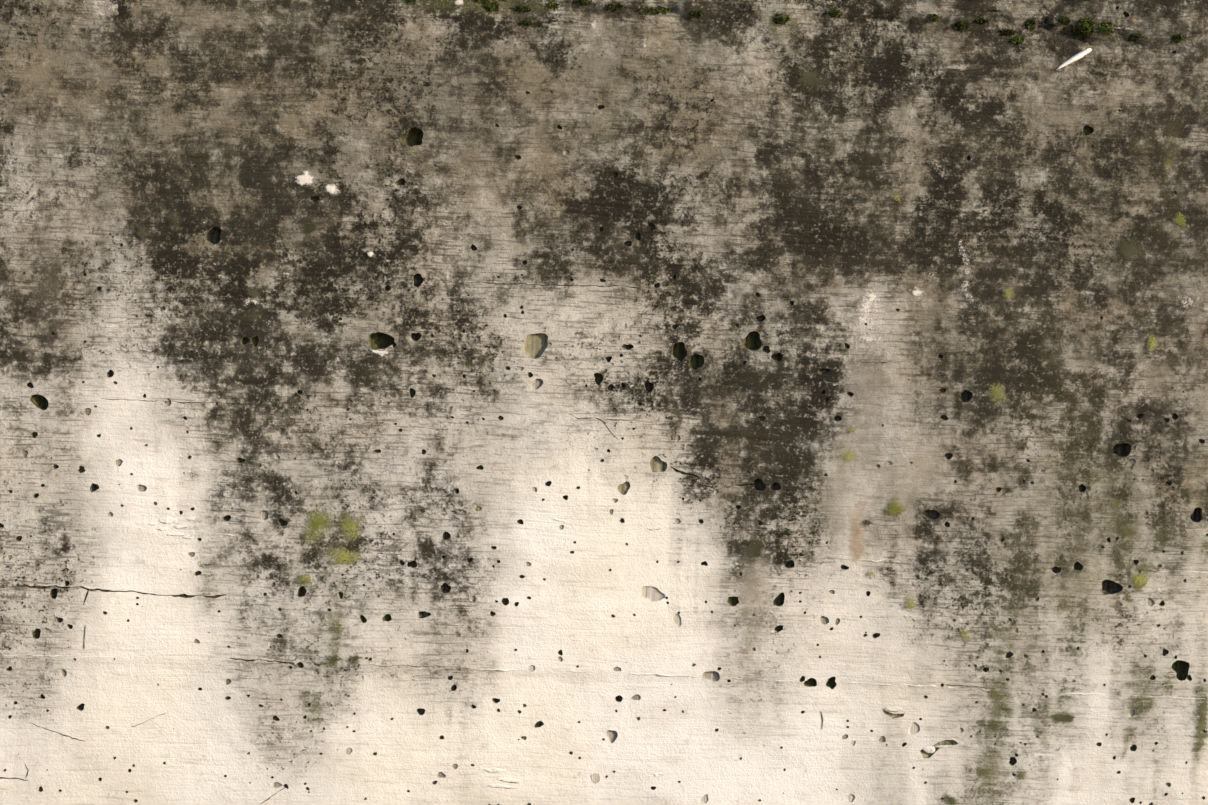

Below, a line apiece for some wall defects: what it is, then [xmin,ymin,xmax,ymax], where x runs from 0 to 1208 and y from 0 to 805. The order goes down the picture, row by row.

damp [0,400,33,451]
damp [1153,558,1186,576]
damp [0,500,95,717]
crack [0,586,227,605]
damp [239,591,375,717]
damp [976,695,1012,743]
damp [1023,688,1050,730]
spalling [920,740,958,758]
damp [943,767,1015,805]